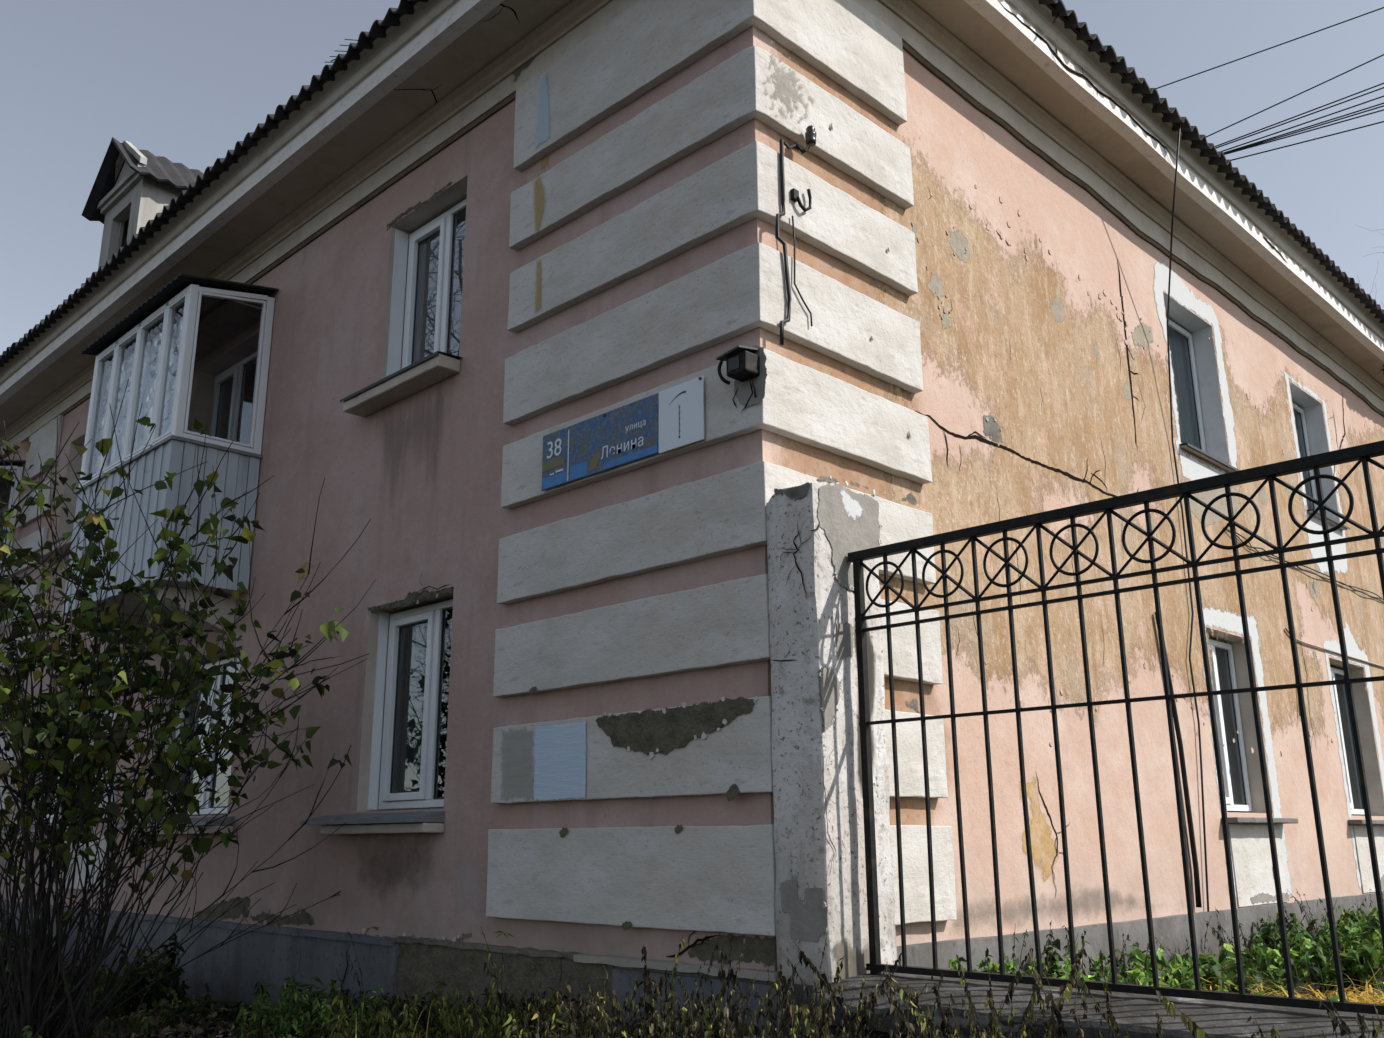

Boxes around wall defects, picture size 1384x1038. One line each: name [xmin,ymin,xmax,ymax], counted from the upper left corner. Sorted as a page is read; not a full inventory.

crack [1117,259,1138,452]
crack [916,411,1139,497]
flaking render [774,139,1384,754]
crack [781,522,821,593]
spalling [595,696,759,760]
peeling [1020,778,1059,881]
peeling [688,875,828,967]